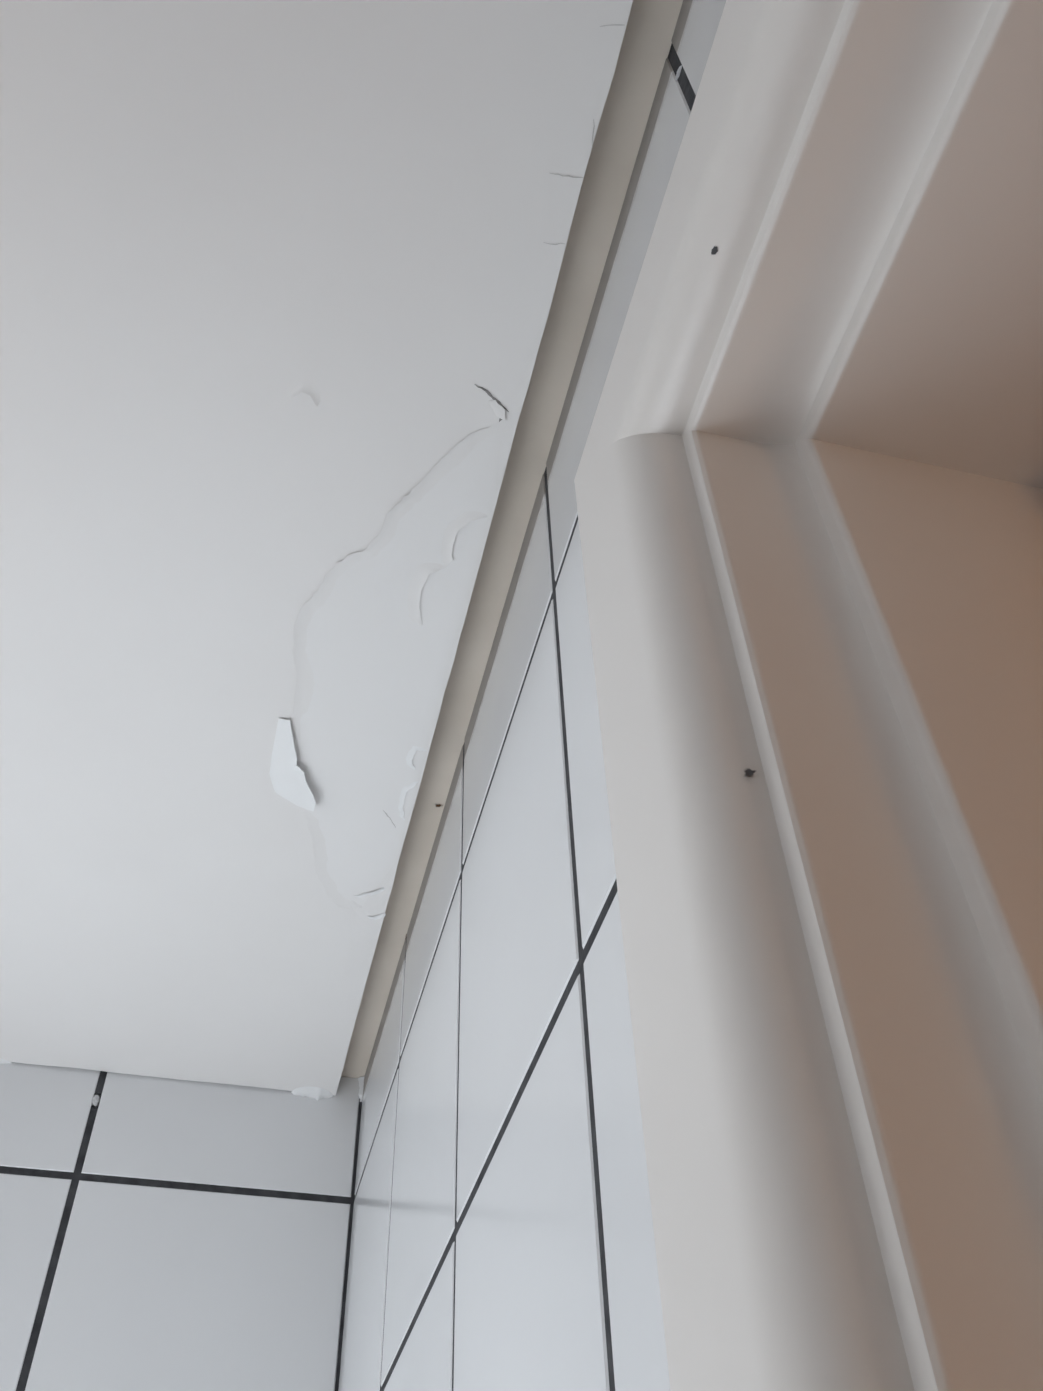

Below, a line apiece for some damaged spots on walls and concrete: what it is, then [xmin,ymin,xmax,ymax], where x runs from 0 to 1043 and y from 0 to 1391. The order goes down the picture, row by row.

peeling [269,421,505,920]